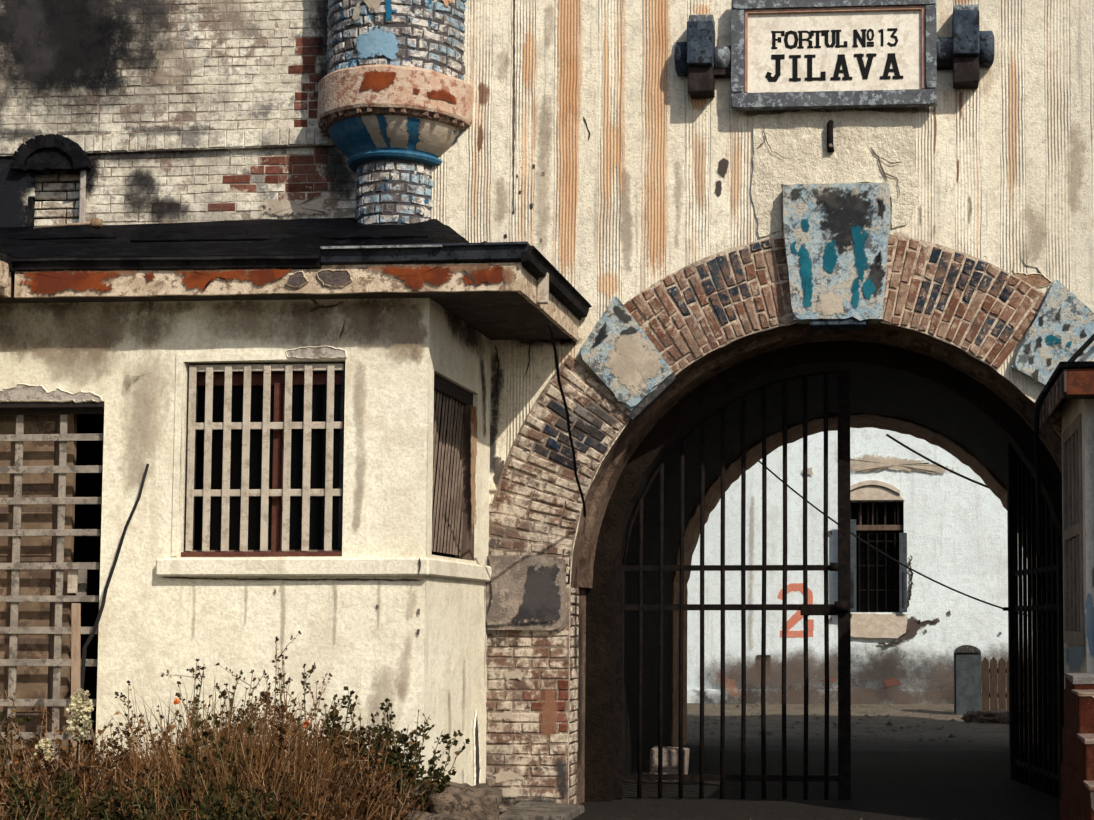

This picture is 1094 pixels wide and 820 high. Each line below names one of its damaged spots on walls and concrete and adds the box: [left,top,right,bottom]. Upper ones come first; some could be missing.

peeling [352,0,400,91]
flaking render [288,37,323,127]
leakage [0,128,42,137]
flaking render [208,147,334,216]
crack [870,147,900,196]
peeling [20,271,119,295]
spalling [177,268,353,292]
peeling [791,187,886,316]
peeling [1025,308,1087,384]
peeling [511,563,562,627]
spalling [896,611,951,641]